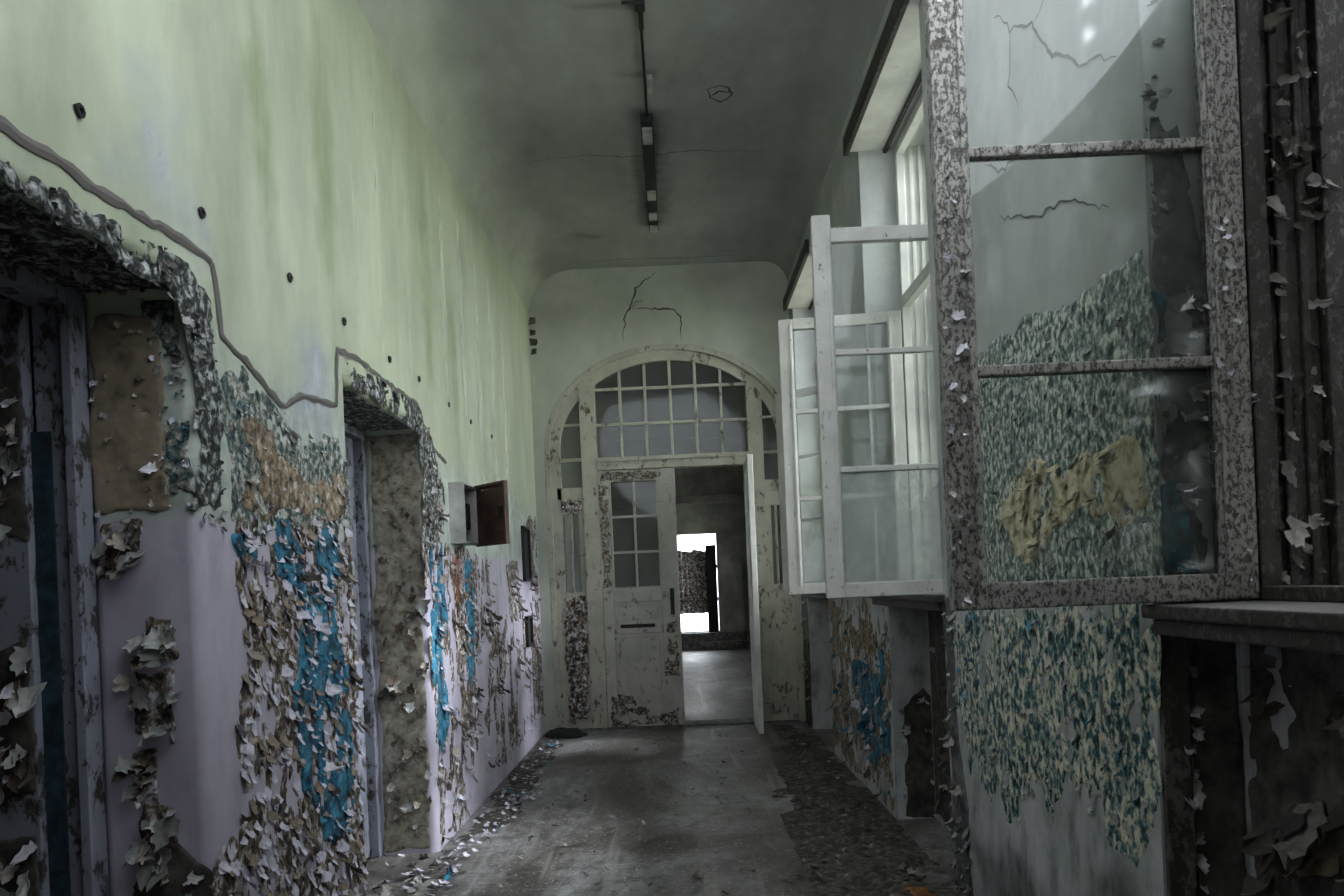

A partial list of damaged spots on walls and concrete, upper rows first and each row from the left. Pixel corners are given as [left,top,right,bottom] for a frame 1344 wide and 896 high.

peeling [1261,0,1296,33]
peeling [1264,28,1341,232]
crack [581,254,737,339]
peeling [937,199,971,329]
peeling [946,75,1326,583]
peeling [1308,298,1344,315]
peeling [561,499,582,515]
peeling [598,469,661,588]
peeling [1276,499,1343,585]
peeling [562,595,589,721]
peeling [800,595,1162,896]
peeling [1184,638,1344,896]